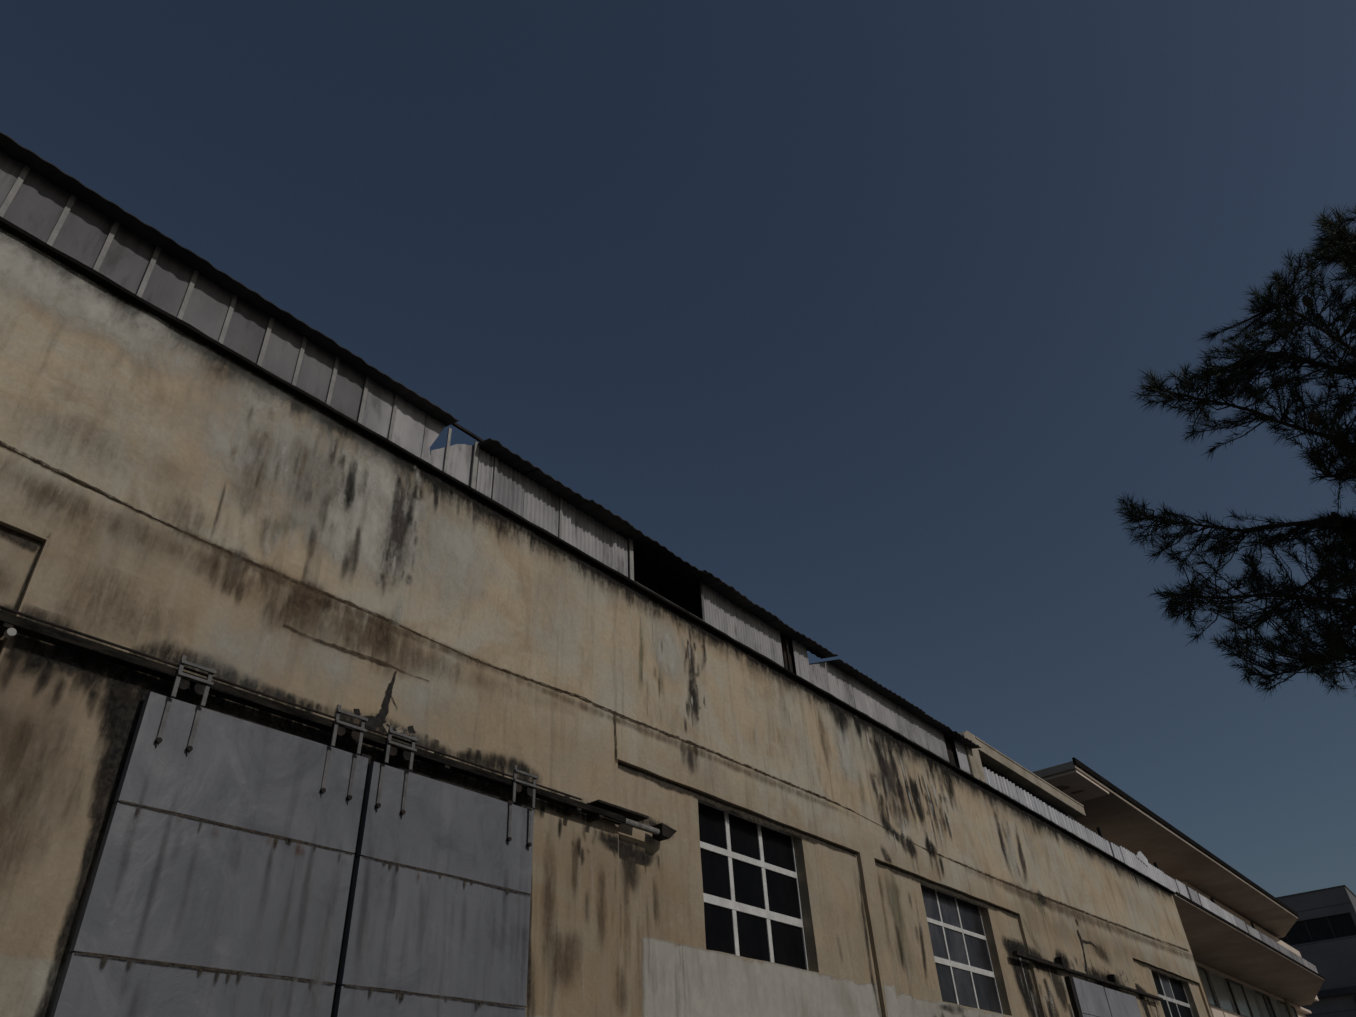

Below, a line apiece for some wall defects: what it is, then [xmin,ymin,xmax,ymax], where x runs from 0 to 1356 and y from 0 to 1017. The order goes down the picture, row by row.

leakage [0,228,1187,1017]
leakage [1133,959,1198,986]